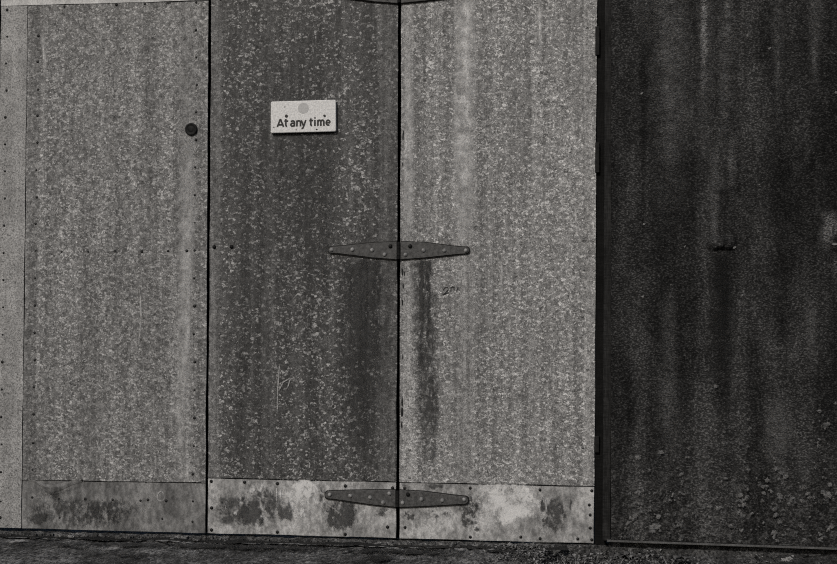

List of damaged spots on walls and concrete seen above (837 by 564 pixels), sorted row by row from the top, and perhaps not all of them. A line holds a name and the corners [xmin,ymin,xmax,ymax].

water stain [700,0,710,91]
rust [417,261,436,427]